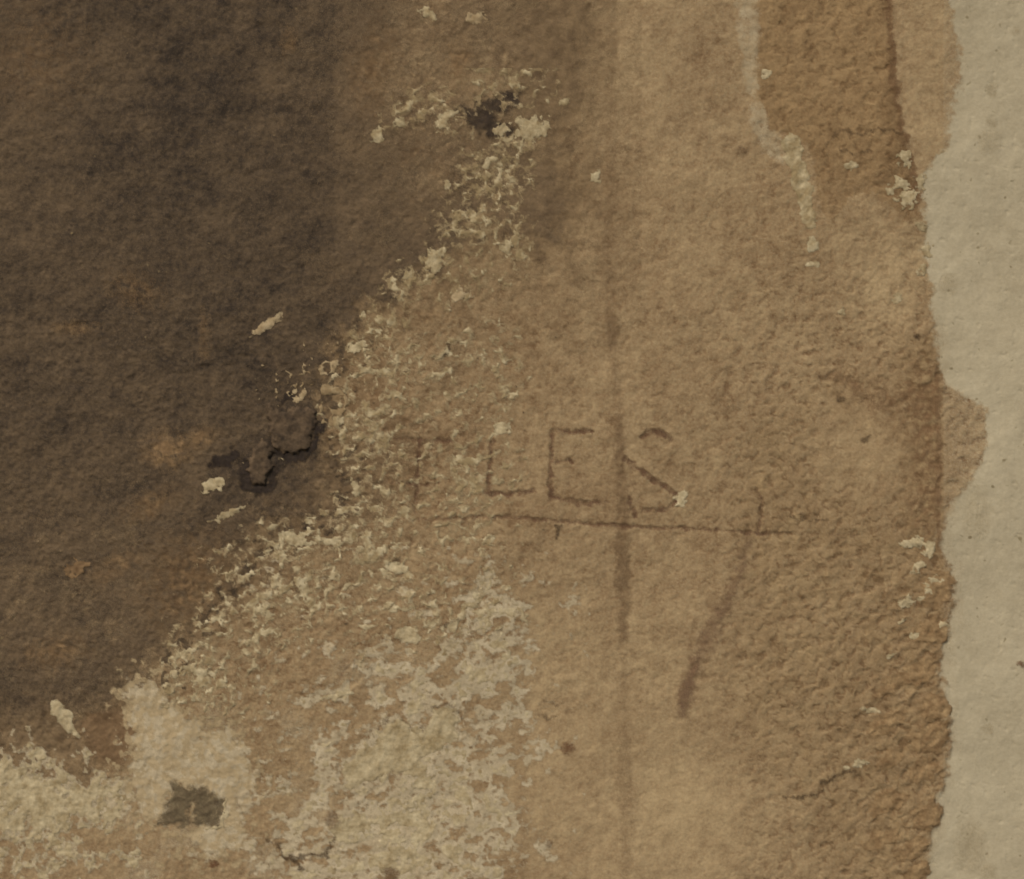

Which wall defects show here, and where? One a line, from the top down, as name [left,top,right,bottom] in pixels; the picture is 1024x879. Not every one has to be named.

peeling [417,6,437,22]
peeling [885,150,935,276]
peeling [0,68,580,879]
damp [26,764,57,783]